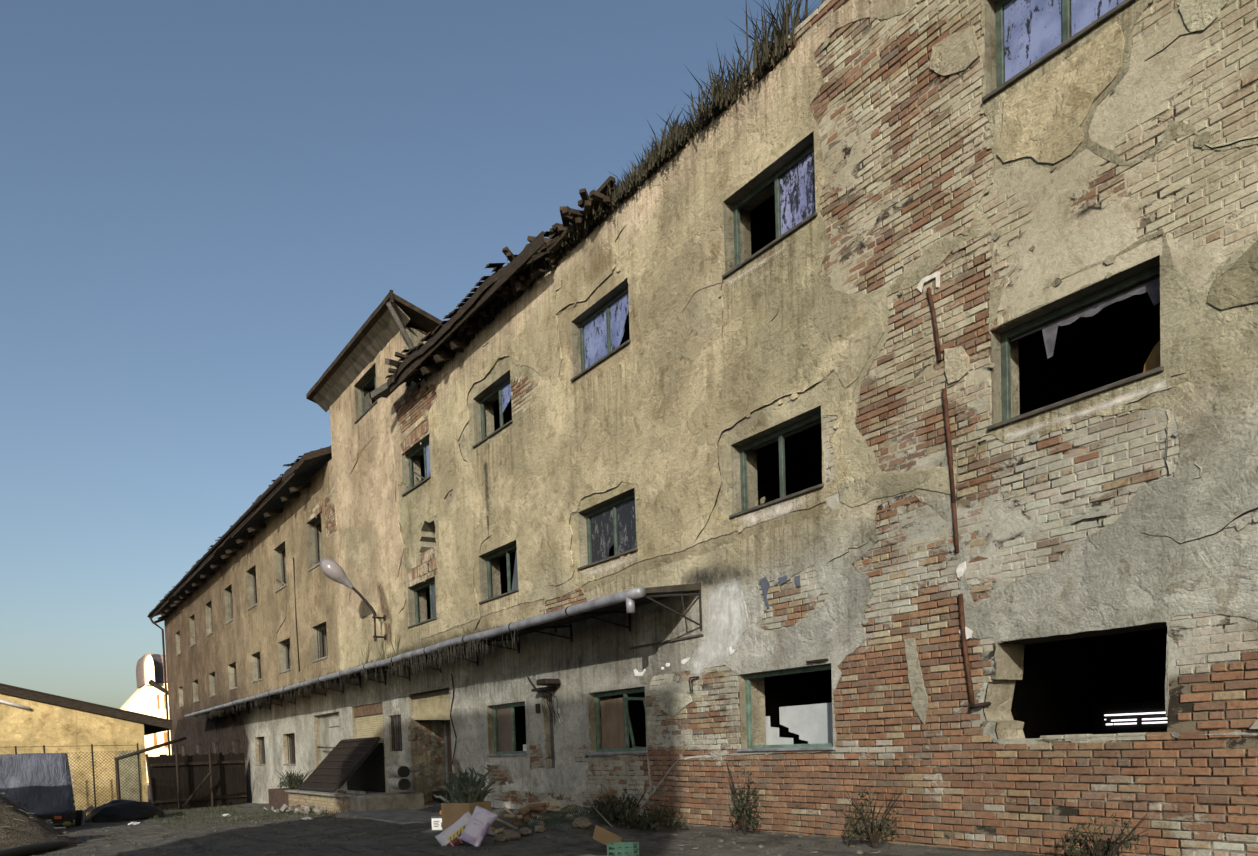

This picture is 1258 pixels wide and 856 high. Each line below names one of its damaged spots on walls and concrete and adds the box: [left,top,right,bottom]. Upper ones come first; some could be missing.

crack [555,225,626,386]
flaking render [394,384,438,458]
flaking render [421,356,841,648]
crack [694,368,834,542]
flaking render [486,0,1258,856]
crack [1143,505,1258,545]